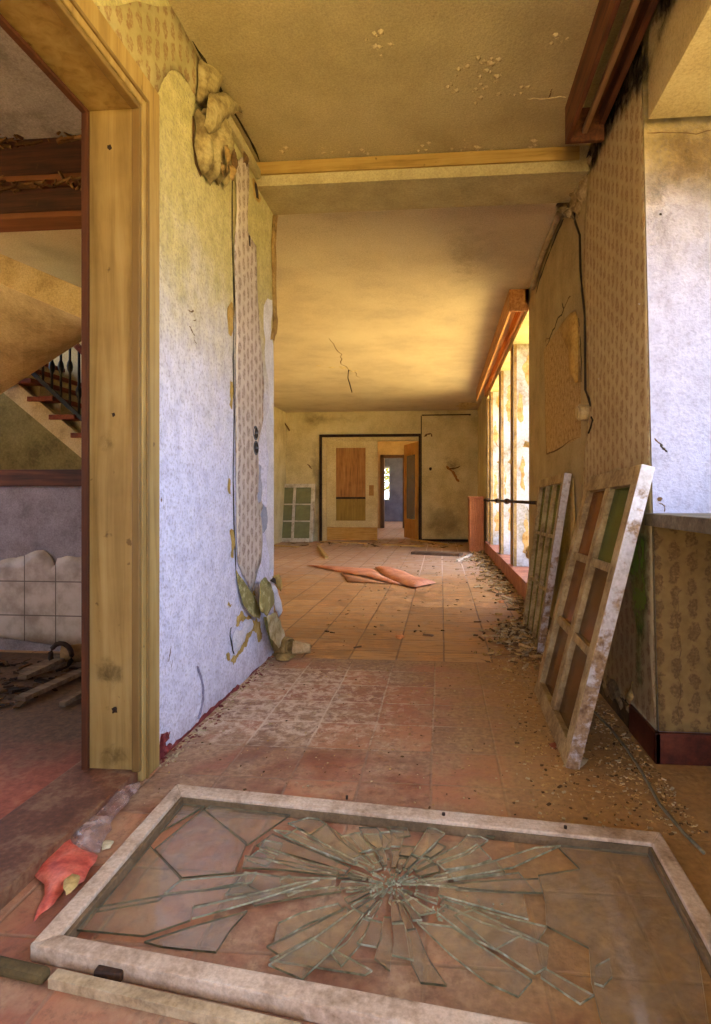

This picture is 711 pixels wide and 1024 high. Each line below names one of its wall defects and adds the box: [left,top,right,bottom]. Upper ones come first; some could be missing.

water stain [659,0,675,38]
water stain [589,36,650,168]
flaking render [257,299,274,572]
peeling [226,602,262,665]